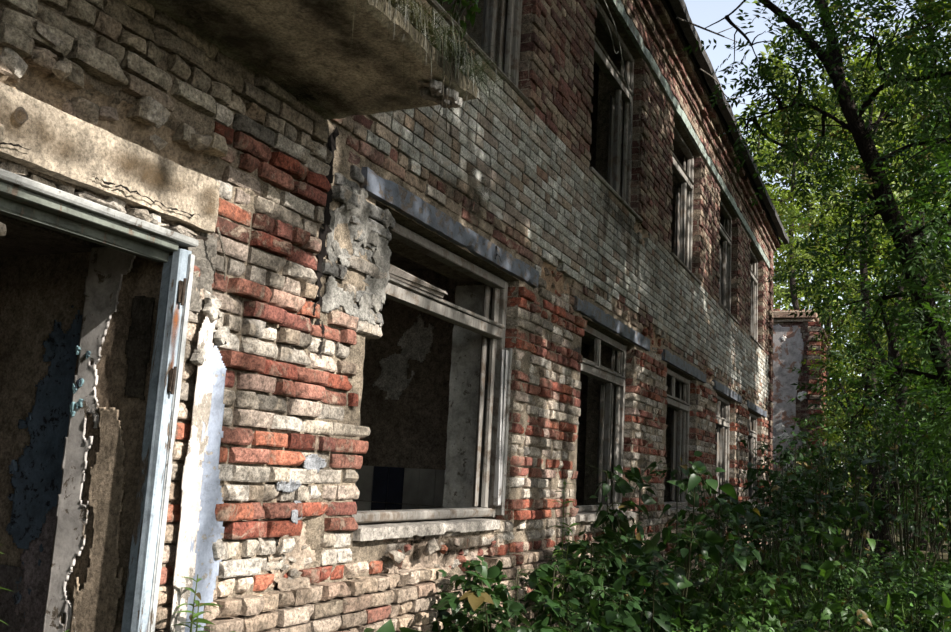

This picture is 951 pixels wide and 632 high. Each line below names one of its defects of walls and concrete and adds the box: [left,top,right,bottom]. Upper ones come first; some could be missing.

flaking render [0,246,163,632]
crack [93,176,202,217]
flaking render [170,231,230,632]
crack [304,126,341,358]
flaking render [321,185,393,327]
flaking render [373,314,434,400]